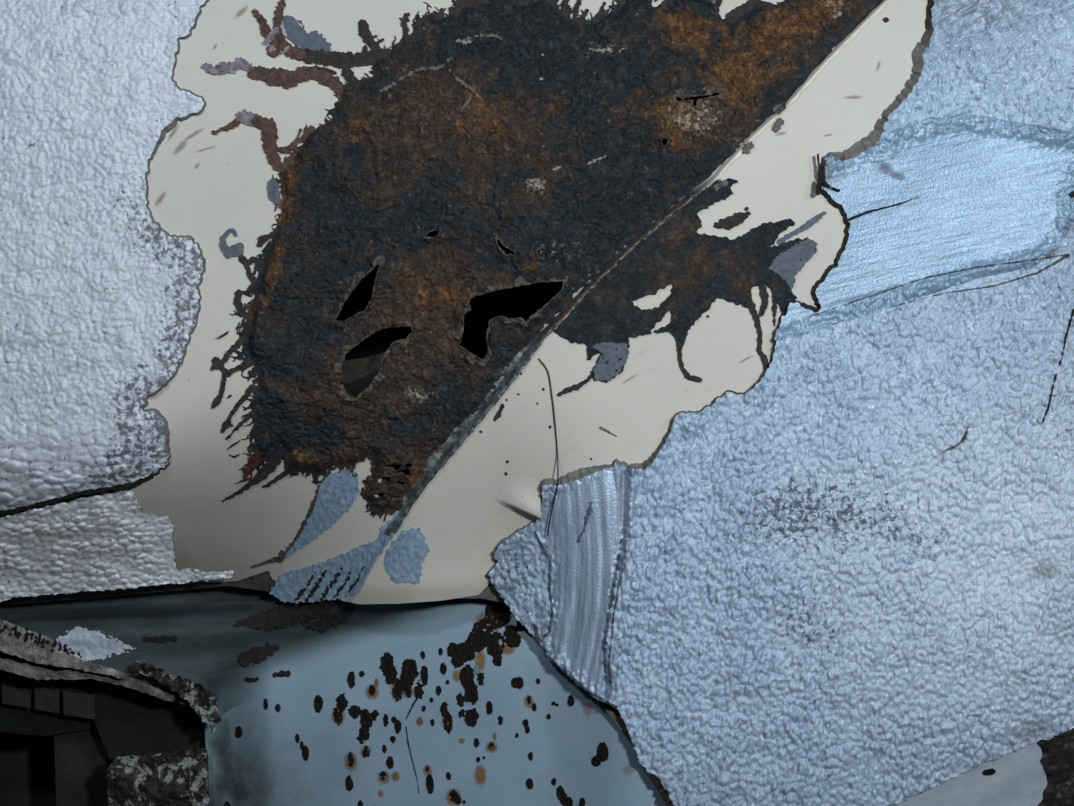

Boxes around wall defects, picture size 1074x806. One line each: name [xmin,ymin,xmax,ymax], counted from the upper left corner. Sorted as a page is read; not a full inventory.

peeling [697,0,927,307]
crack [848,196,920,221]
peeling [112,0,782,604]
rust [201,0,884,522]
crack [808,253,1070,317]
crack [1042,308,1074,423]
crack [0,475,154,516]
spalling [0,651,91,689]
spalling [173,700,205,731]
rust [314,601,524,806]
rust [511,677,574,738]
rust [551,778,585,806]